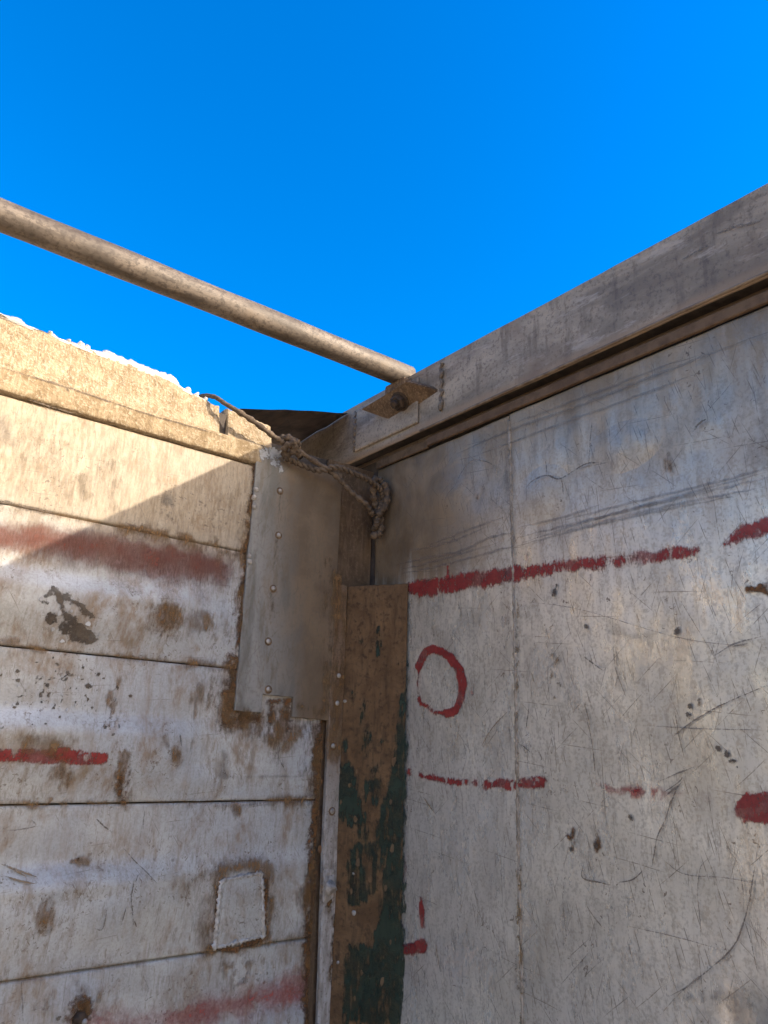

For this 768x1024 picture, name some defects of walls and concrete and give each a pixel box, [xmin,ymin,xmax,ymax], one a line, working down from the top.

rust [117,463,329,1024]
peeling [338,661,409,1024]